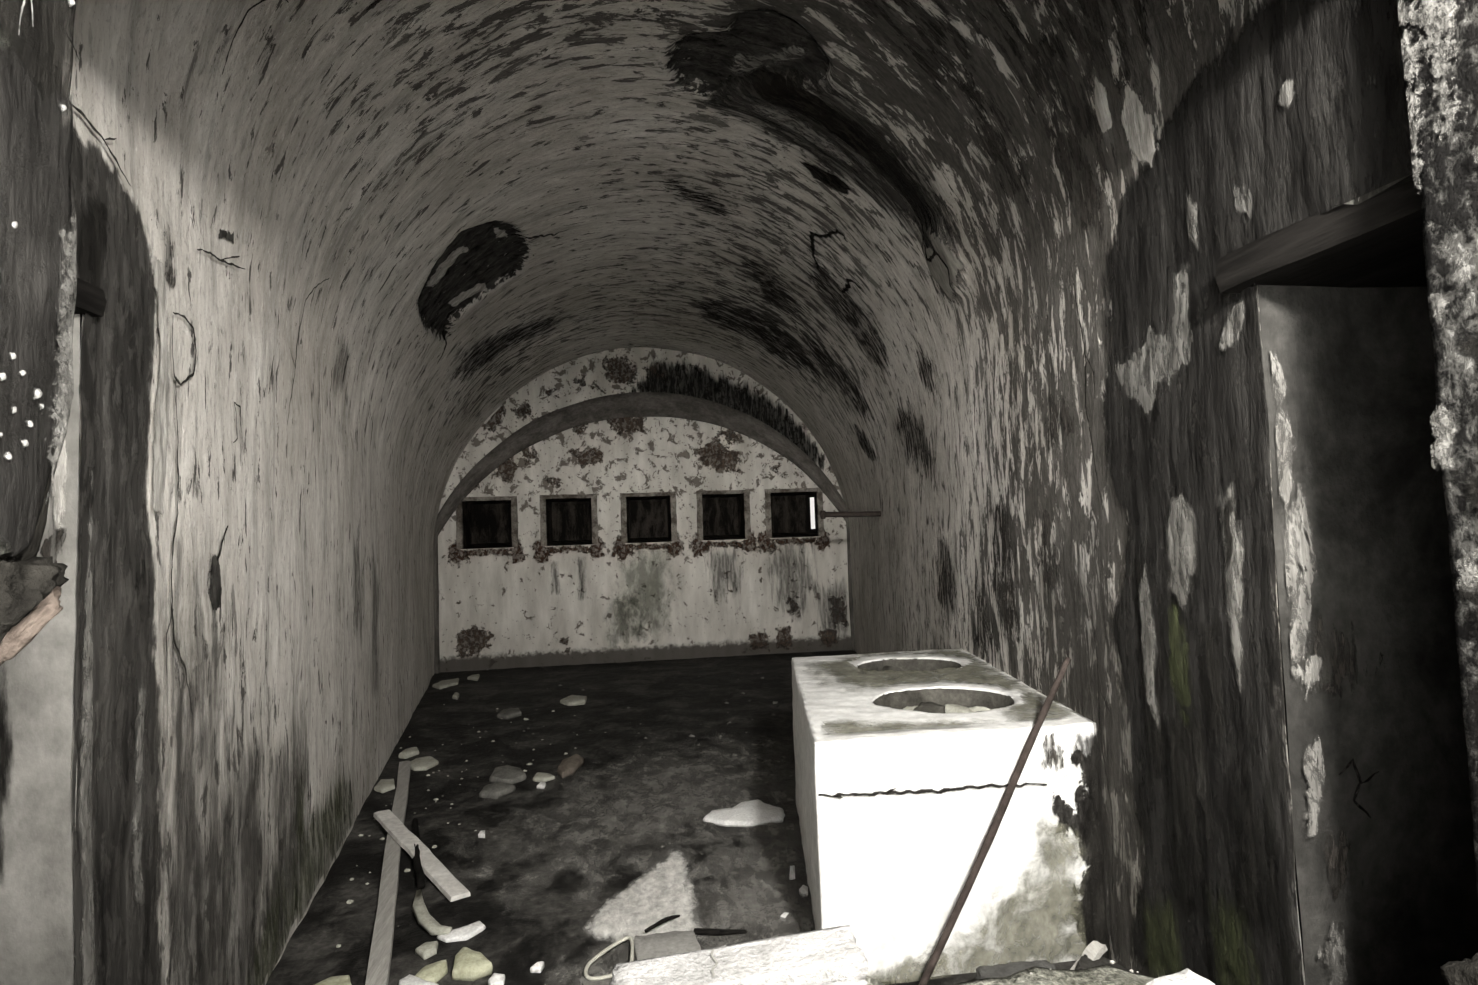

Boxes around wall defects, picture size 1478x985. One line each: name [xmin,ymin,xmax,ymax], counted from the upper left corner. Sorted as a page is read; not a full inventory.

flaking render [417,220,566,364]
flaking render [451,316,561,380]
leakage [613,557,662,643]
leakage [711,549,740,598]
leakage [631,361,831,473]
leakage [769,547,847,633]
flaking render [855,0,1471,985]
leakage [1220,499,1233,565]
flaking render [1430,403,1478,508]
leakage [1039,539,1273,985]
crack [1339,759,1379,818]